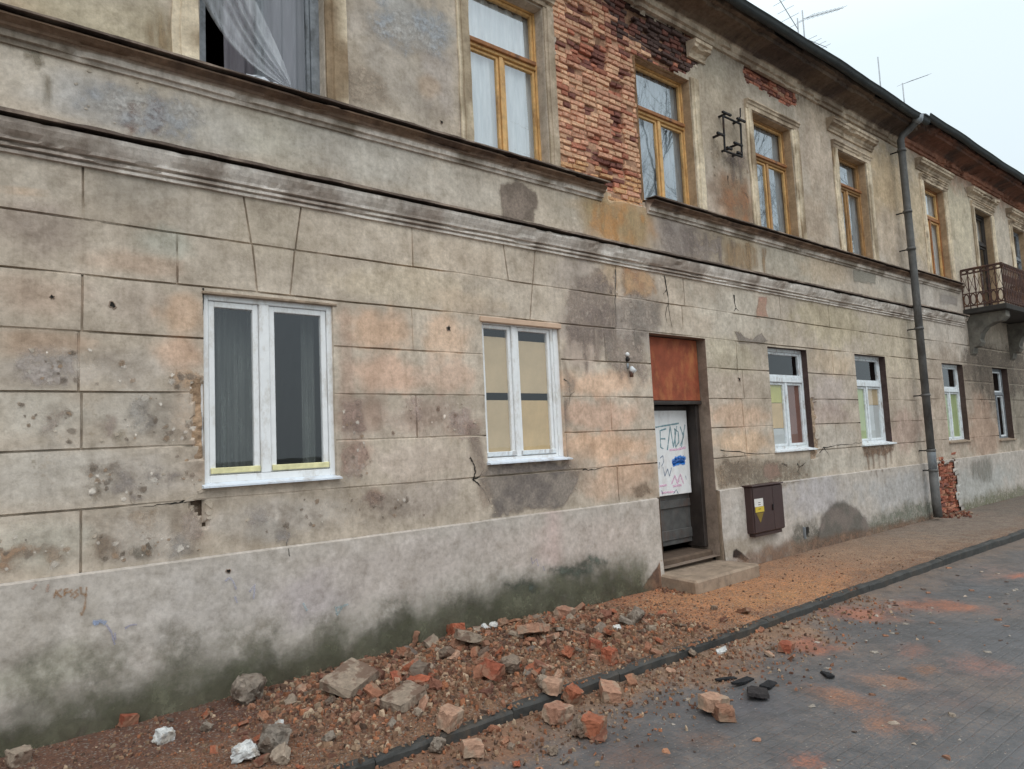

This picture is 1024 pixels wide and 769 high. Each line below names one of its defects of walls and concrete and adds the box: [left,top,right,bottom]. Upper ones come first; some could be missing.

spalling [546,0,698,206]
spalling [743,66,797,108]
spalling [121,372,213,526]
peeling [89,463,113,497]
crack [469,457,490,502]
spalling [937,452,961,513]
leakage [817,502,869,549]
leakage [555,556,606,576]